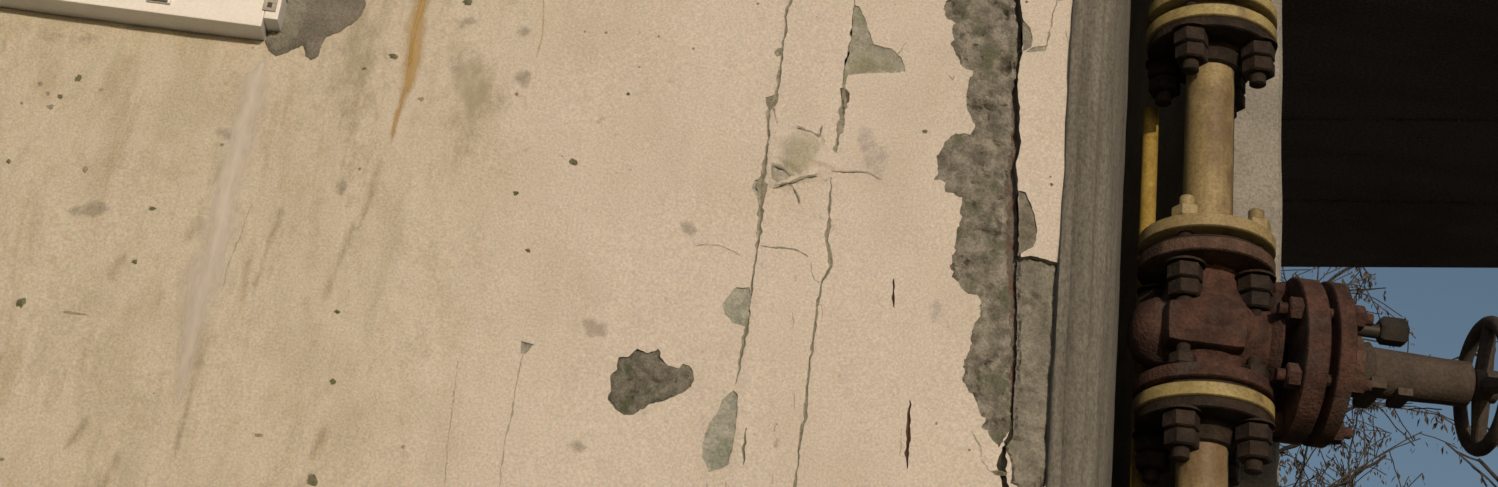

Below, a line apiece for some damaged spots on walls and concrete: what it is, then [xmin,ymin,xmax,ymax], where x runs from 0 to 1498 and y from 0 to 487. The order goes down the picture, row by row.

corrosion [392,0,426,136]
peeling [844,6,905,75]
peeling [766,118,882,202]
crack [696,0,856,487]
spalling [934,0,1056,487]
peeling [722,288,751,327]
crack [499,341,533,487]
spalling [608,350,694,415]
peeling [702,391,738,472]
crack [971,419,1014,487]